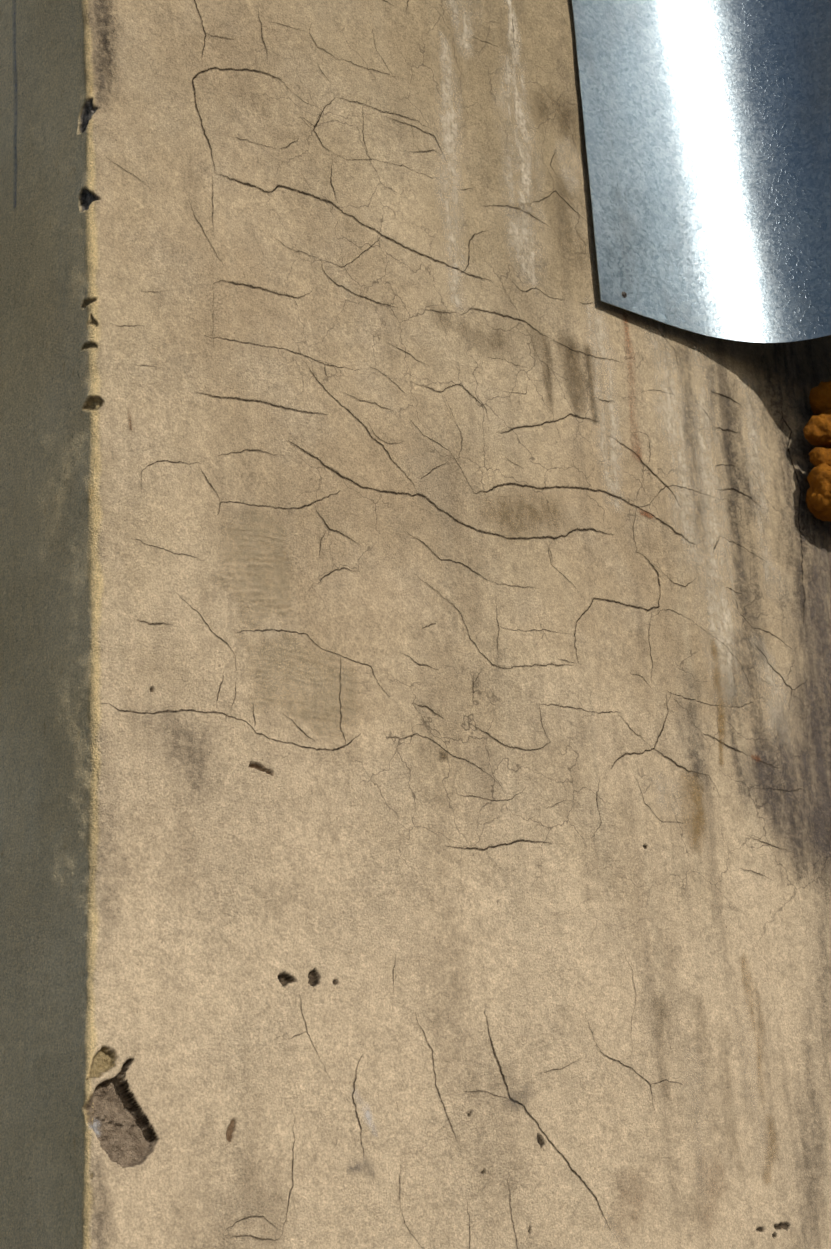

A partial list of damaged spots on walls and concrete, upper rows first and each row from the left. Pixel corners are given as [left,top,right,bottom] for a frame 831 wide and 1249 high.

spalling [79,98,98,133]
spalling [80,189,100,212]
crack [192,0,616,361]
spalling [82,299,98,327]
spalling [84,397,103,411]
damp [567,308,619,506]
crack [102,335,806,835]
damp [658,340,831,861]
crack [447,839,548,850]
spalling [85,1047,157,1168]
crack [416,1012,609,1227]
crack [231,1132,295,1240]